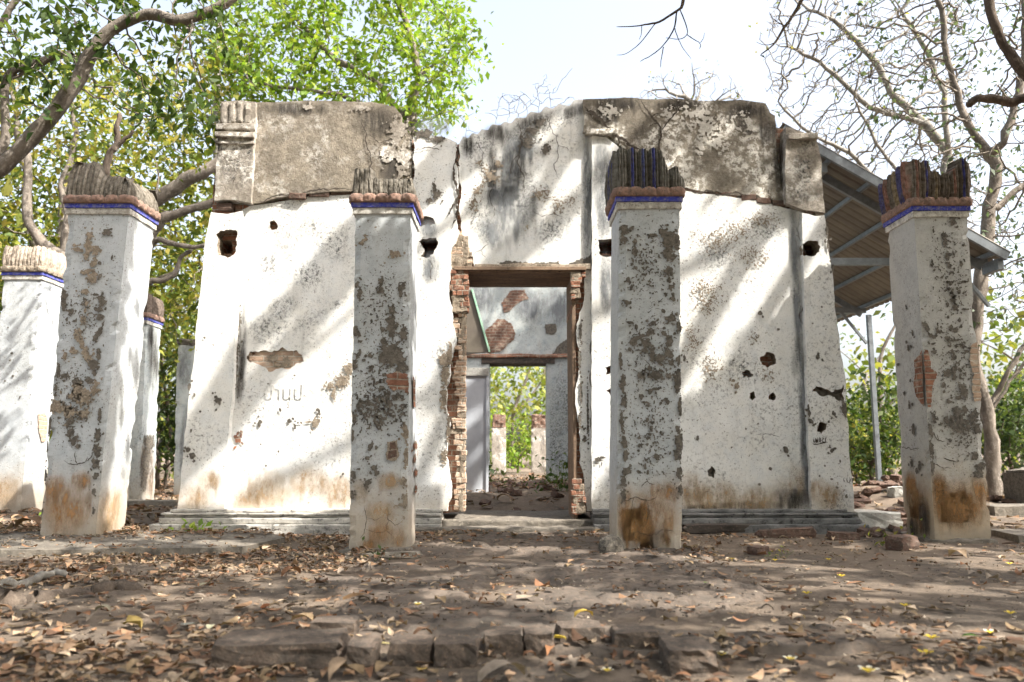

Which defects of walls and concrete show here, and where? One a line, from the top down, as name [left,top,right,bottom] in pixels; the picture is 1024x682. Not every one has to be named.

crack [360,112,568,229]
damp [466,106,582,246]
peeling [592,99,627,120]
peeling [651,97,753,159]
flaking render [38,227,115,516]
flaking render [235,304,304,399]
flaking render [322,249,419,519]
flaking render [485,290,529,353]
flaking render [618,209,784,507]
flaking render [903,217,987,478]